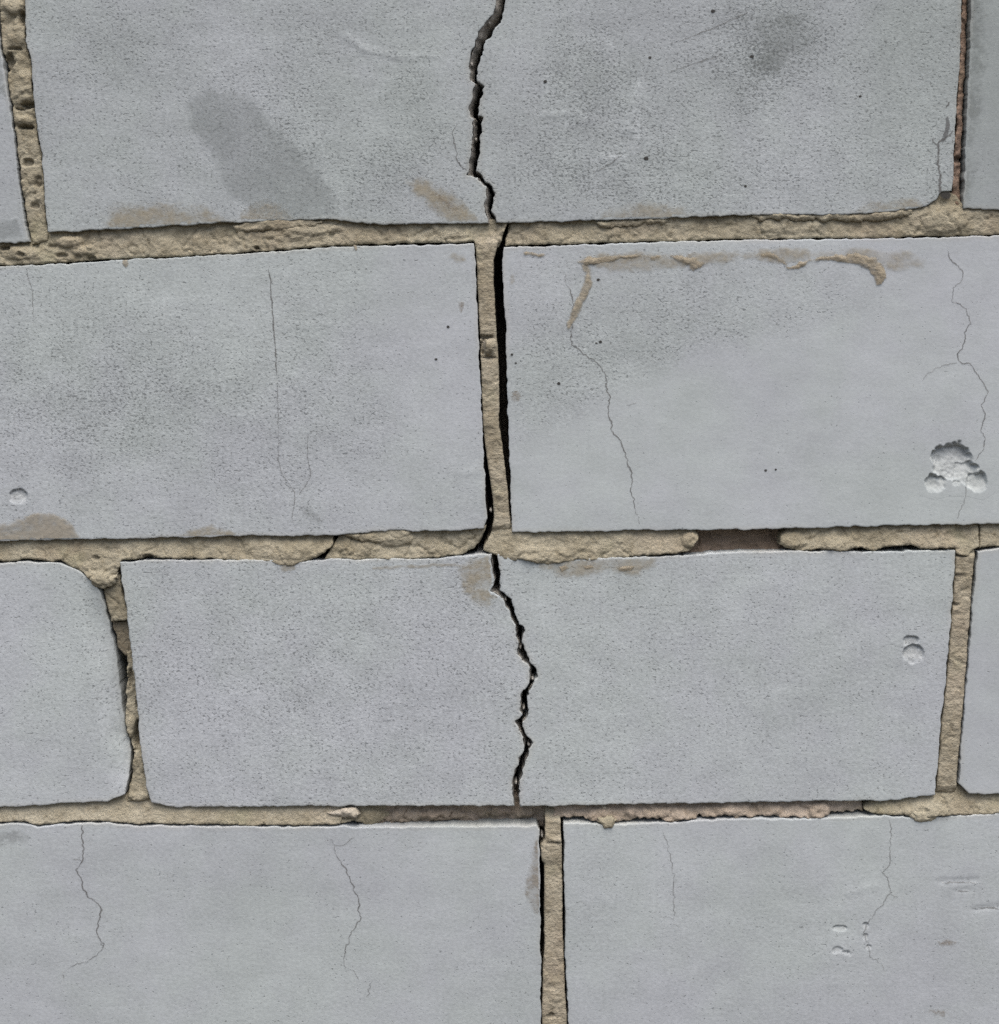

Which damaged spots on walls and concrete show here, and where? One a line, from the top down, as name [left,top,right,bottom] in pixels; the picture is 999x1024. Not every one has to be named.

crack [452,0,534,804]
crack [569,288,635,507]
crack [948,253,988,458]
crack [71,826,105,967]
crack [332,841,362,971]
crack [538,824,546,997]